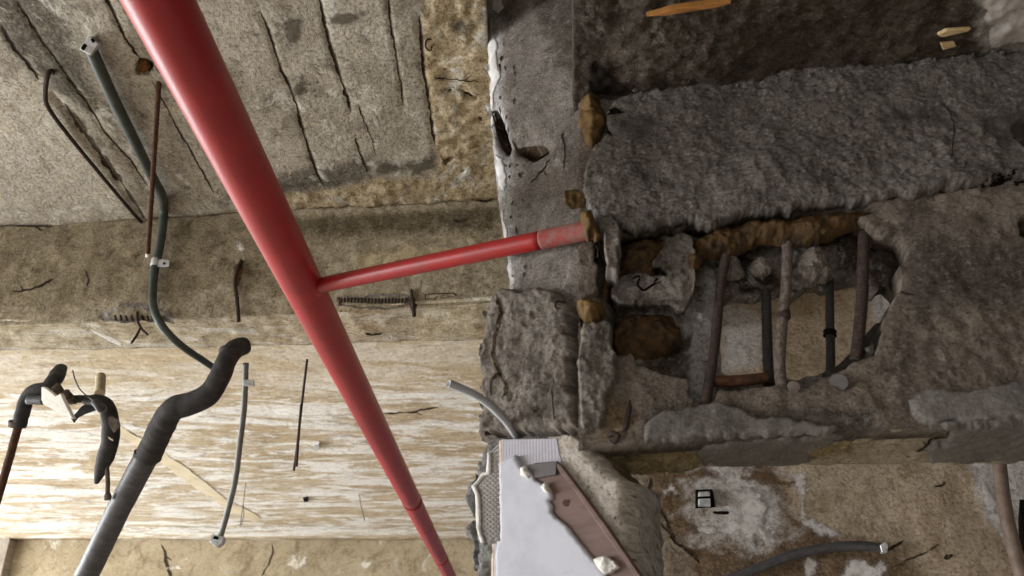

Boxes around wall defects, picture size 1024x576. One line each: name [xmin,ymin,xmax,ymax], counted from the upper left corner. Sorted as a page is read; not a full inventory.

crack [0,0,148,218]
rust [136,60,149,75]
crack [261,13,325,189]
crack [319,0,376,172]
crack [388,0,565,233]
peeling [485,0,549,191]
spalling [613,228,899,405]
crack [385,407,438,415]
damp [663,469,719,511]
damp [685,470,837,540]